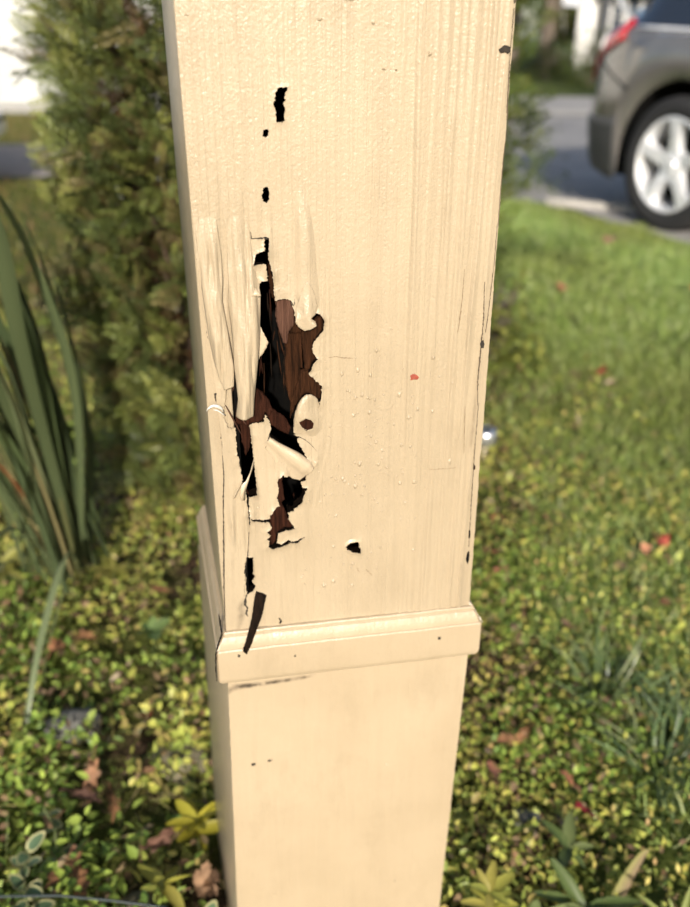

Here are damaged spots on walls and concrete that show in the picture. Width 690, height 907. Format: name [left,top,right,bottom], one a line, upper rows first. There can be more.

peeling [291,281,324,372]
peeling [195,216,314,548]
peeling [291,386,323,438]
crack [215,437,249,680]
spalling [344,539,361,555]